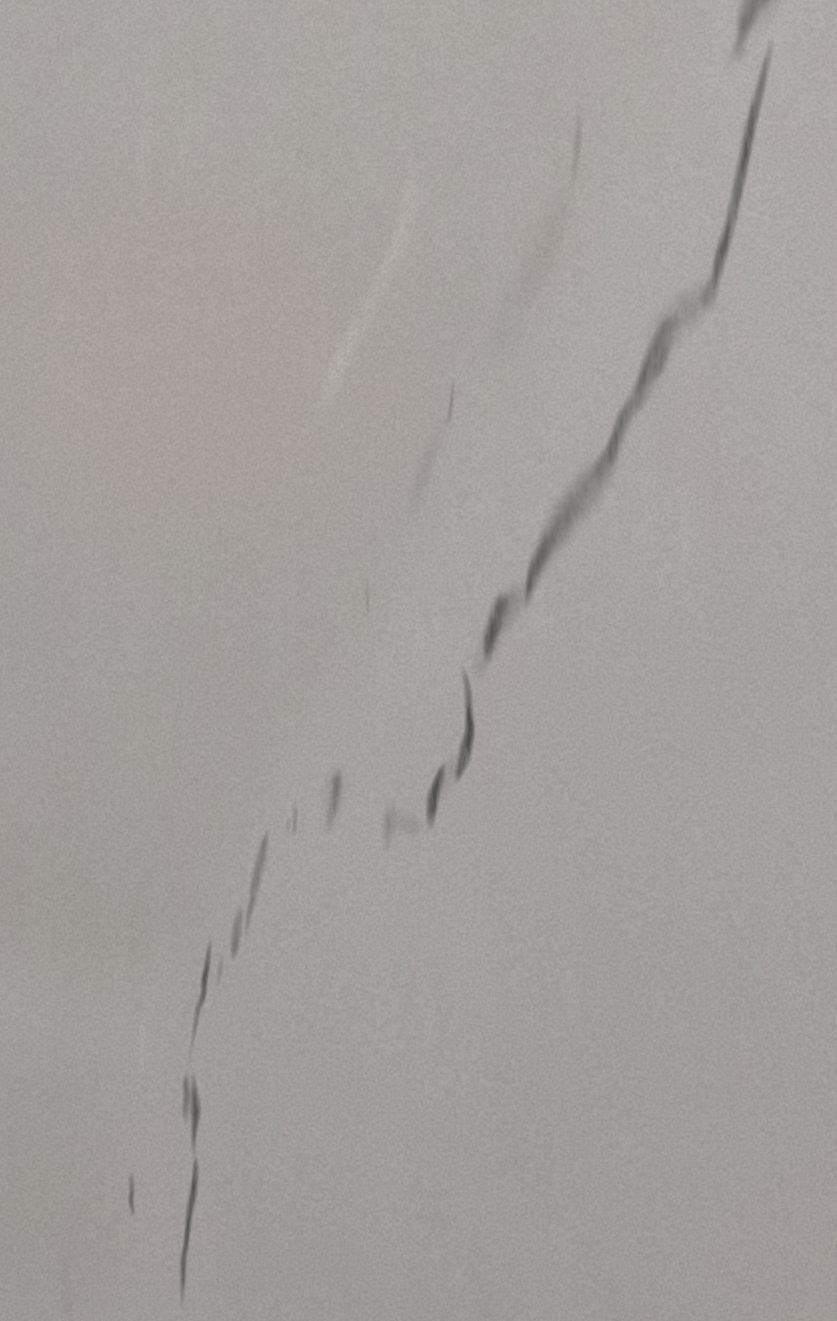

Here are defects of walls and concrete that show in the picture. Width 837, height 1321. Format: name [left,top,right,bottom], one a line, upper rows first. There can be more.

crack [715,117,754,273]
crack [489,609,499,643]
crack [429,705,473,813]
crack [201,966,209,995]
crack [192,1098,200,1128]
crack [182,1177,195,1274]